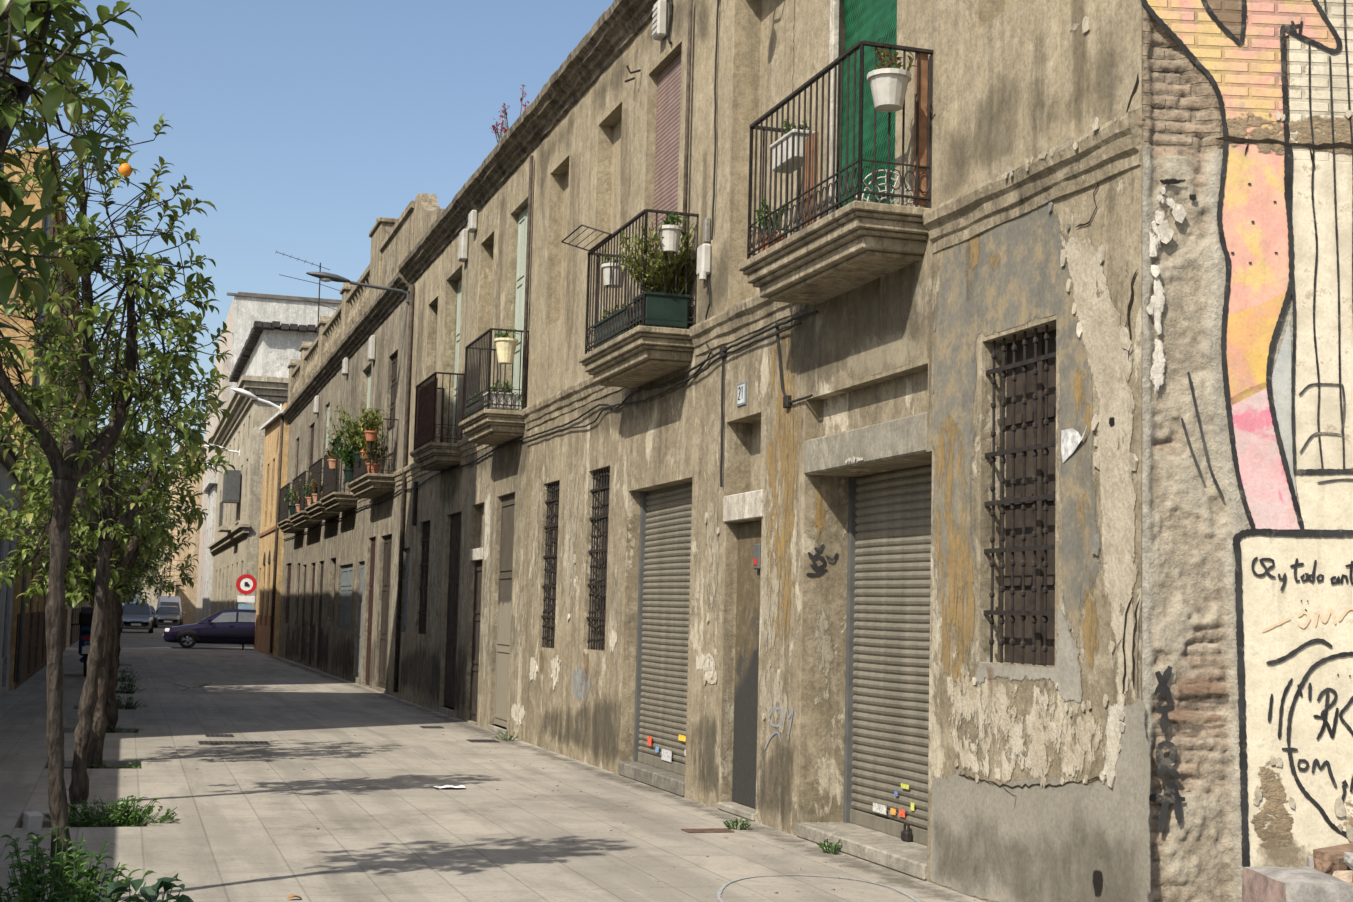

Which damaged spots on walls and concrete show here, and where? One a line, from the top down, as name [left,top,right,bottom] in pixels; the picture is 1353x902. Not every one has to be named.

peeling [1146,187,1186,393]
peeling [931,201,1138,788]
damp [544,702,617,757]
spalling [1154,677,1226,723]
spalling [1251,756,1295,848]
spalling [1334,792,1353,842]